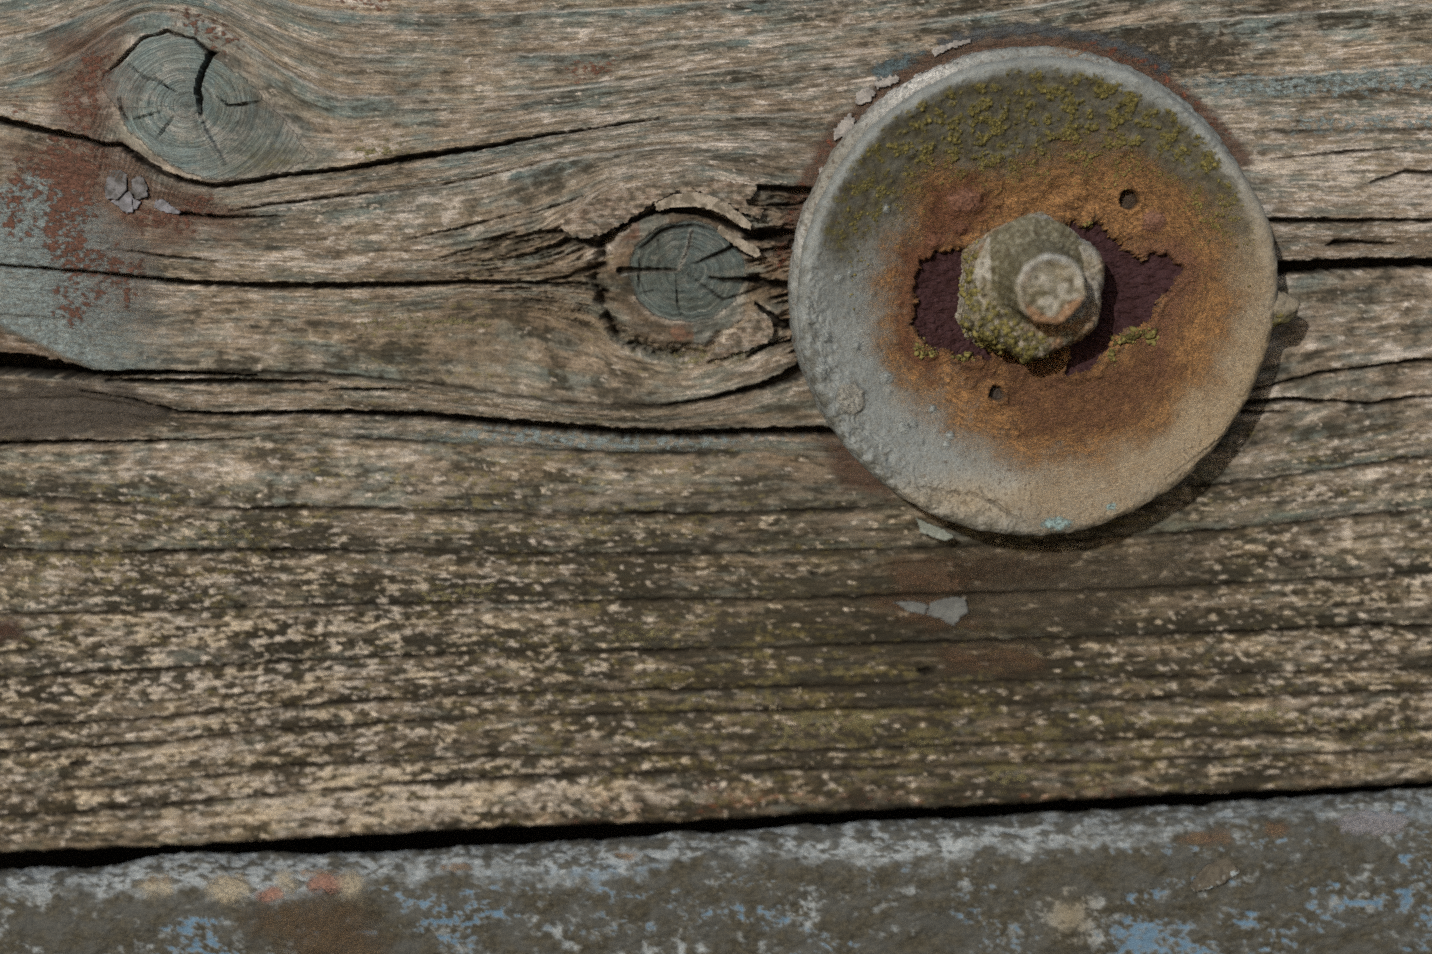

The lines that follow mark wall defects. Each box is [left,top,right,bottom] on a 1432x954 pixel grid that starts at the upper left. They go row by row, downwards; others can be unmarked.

peeling [104,170,181,214]
crack [0,28,671,221]
rust [776,33,1251,267]
crack [1267,143,1432,278]
crack [0,183,838,448]
rust [873,152,1232,465]
rust [828,442,882,490]
crack [1164,356,1432,482]